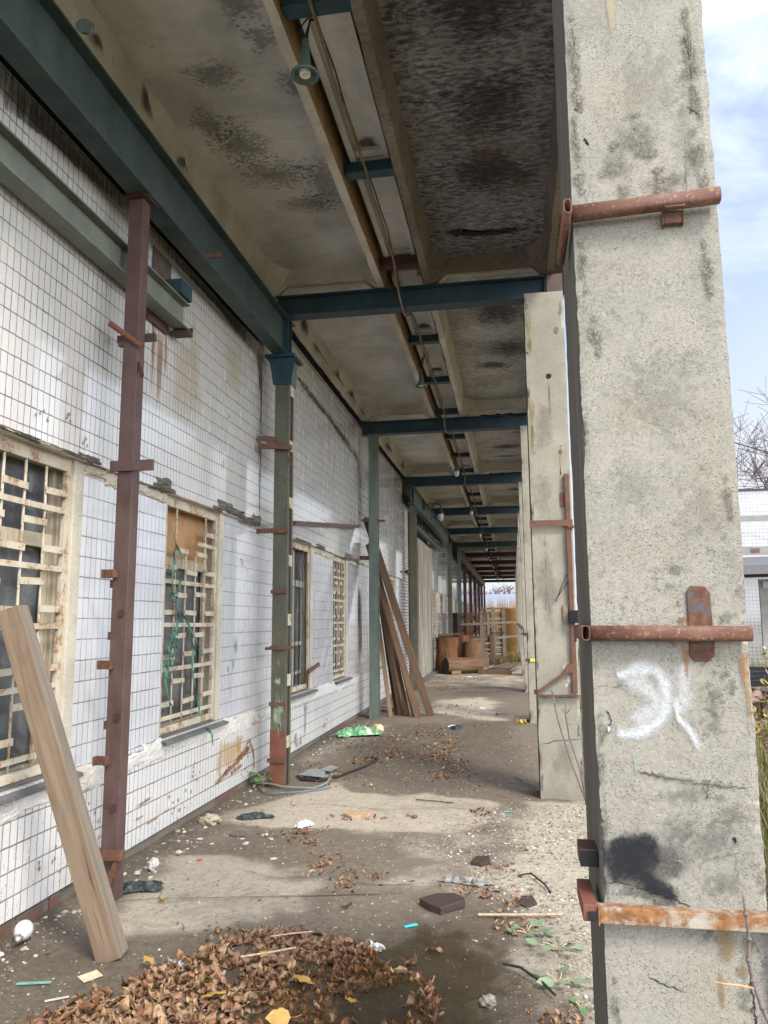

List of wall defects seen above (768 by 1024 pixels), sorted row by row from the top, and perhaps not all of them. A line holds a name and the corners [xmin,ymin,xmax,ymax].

leakage [144,87,152,116]
peeling [139,476,176,504]
spalling [212,499,262,527]
corrosion [215,739,255,785]
crack [620,761,748,801]